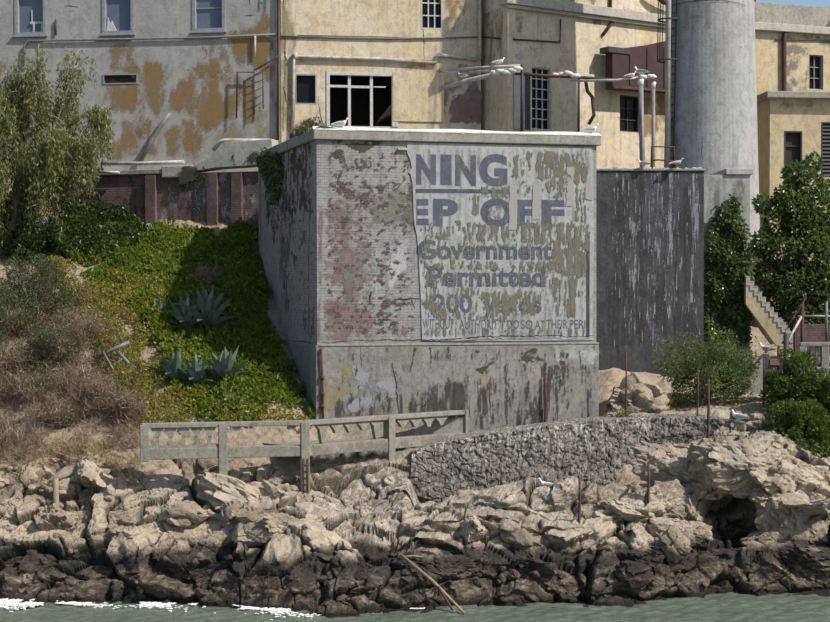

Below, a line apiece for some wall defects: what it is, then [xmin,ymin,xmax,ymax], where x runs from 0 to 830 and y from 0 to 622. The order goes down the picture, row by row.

spalling [444,64,483,124]
flaking render [266,143,590,341]
leakage [609,171,700,347]
leakage [324,345,597,429]